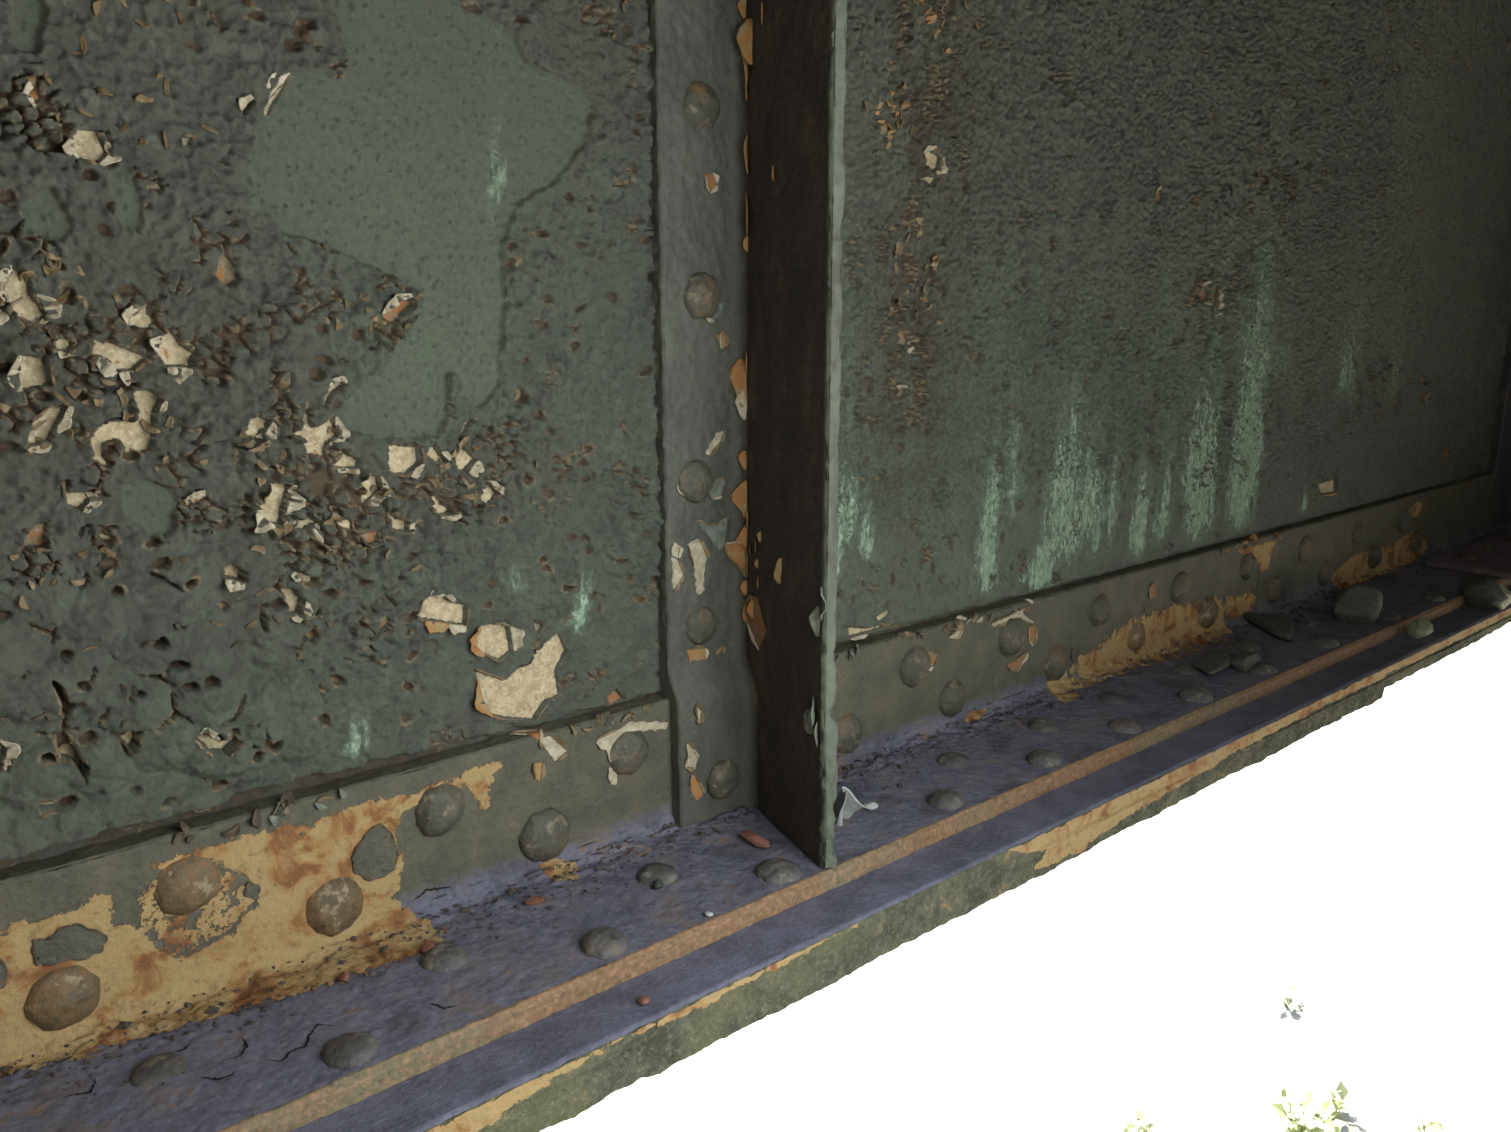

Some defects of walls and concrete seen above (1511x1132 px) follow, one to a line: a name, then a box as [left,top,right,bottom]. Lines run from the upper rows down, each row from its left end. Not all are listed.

peeling [55,107,218,166]
peeling [238,72,290,115]
peeling [736,0,763,101]
peeling [0,248,195,465]
peeling [706,303,747,420]
peeling [60,481,102,514]
peeling [232,376,505,570]
peeling [671,451,782,650]
corrosion [1238,539,1276,572]
corrosion [1331,501,1429,589]
corrosion [1009,592,1511,870]
corrosion [0,761,507,1077]